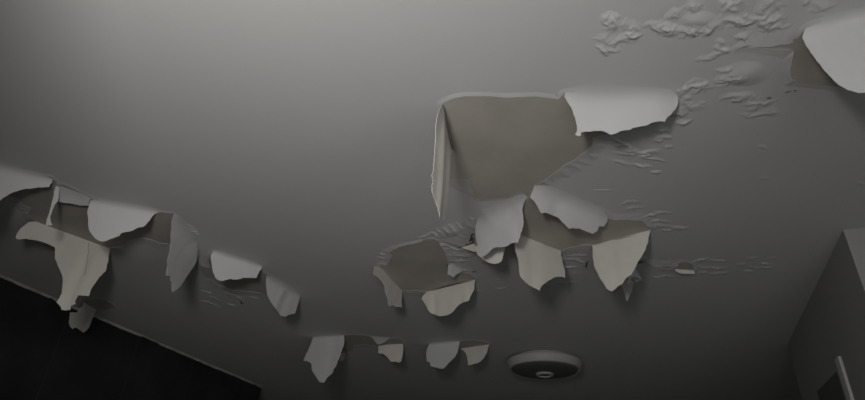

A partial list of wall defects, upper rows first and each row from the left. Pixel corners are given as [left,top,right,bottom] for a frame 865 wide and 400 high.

peeling [730,7,865,93]
peeling [373,85,689,316]
peeling [0,164,300,333]
peeling [303,334,406,383]
peeling [426,339,491,369]